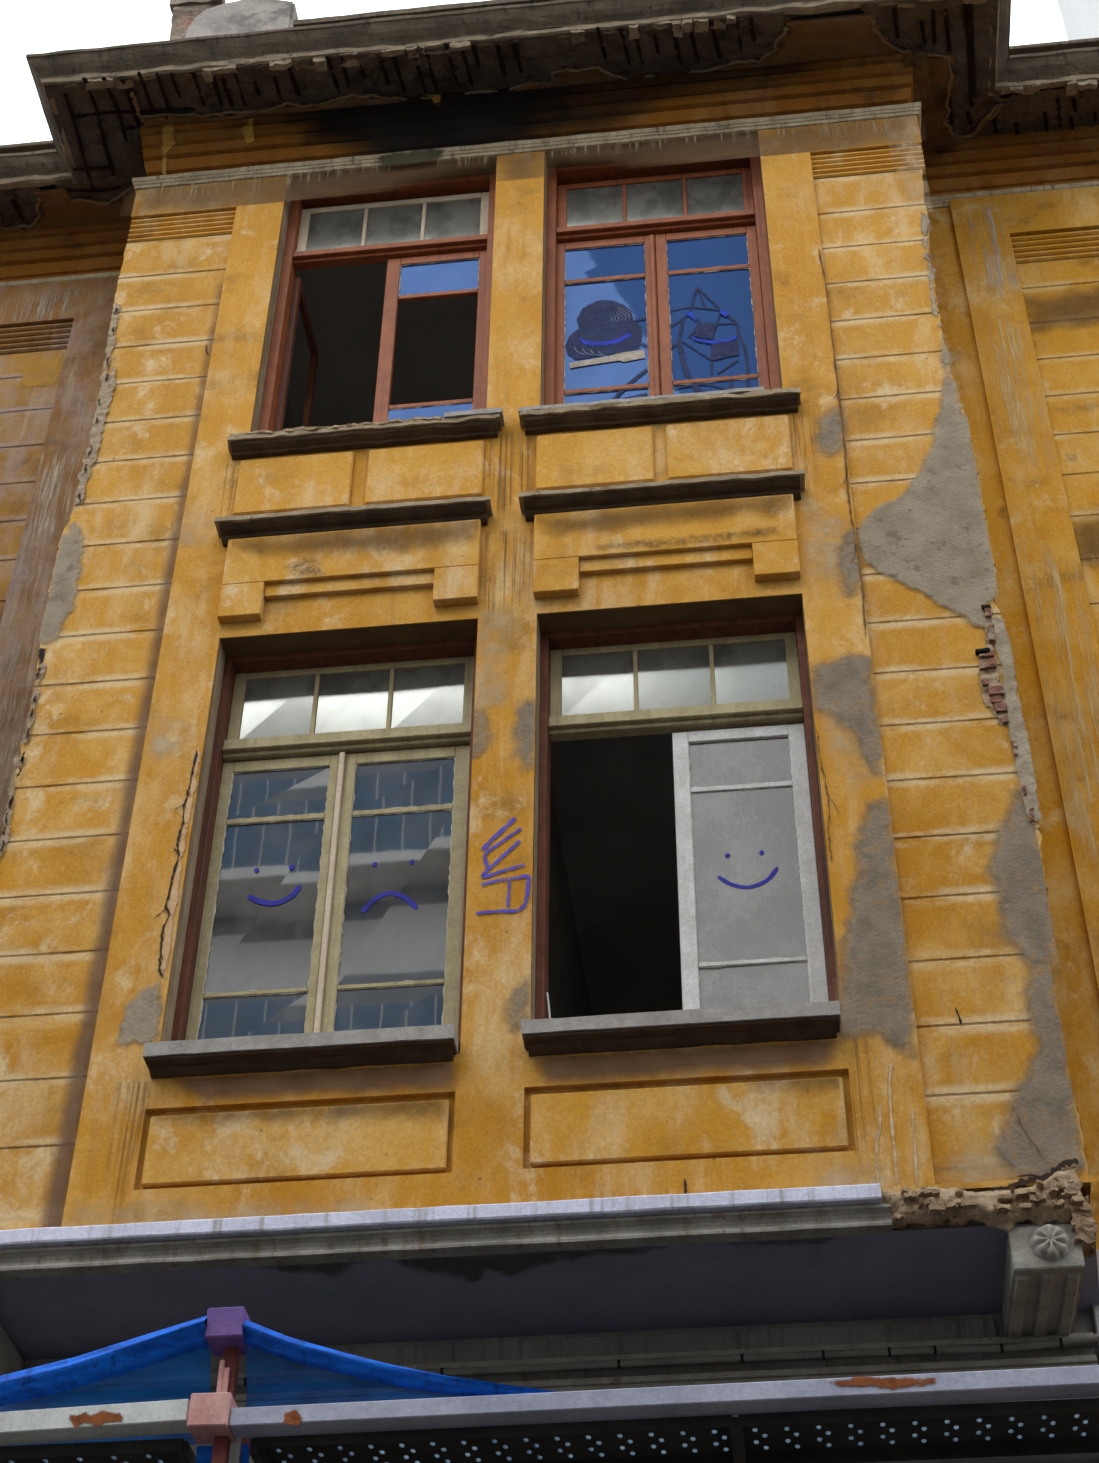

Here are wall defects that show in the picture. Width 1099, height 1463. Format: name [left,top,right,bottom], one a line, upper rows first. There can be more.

flaking render [0,302,121,856]
flaking render [812,212,1085,1179]
peeling [1034,561,1099,858]
flaking render [117,750,201,1044]
crack [153,750,198,977]
rust [70,1411,123,1427]
rust [831,1376,936,1389]